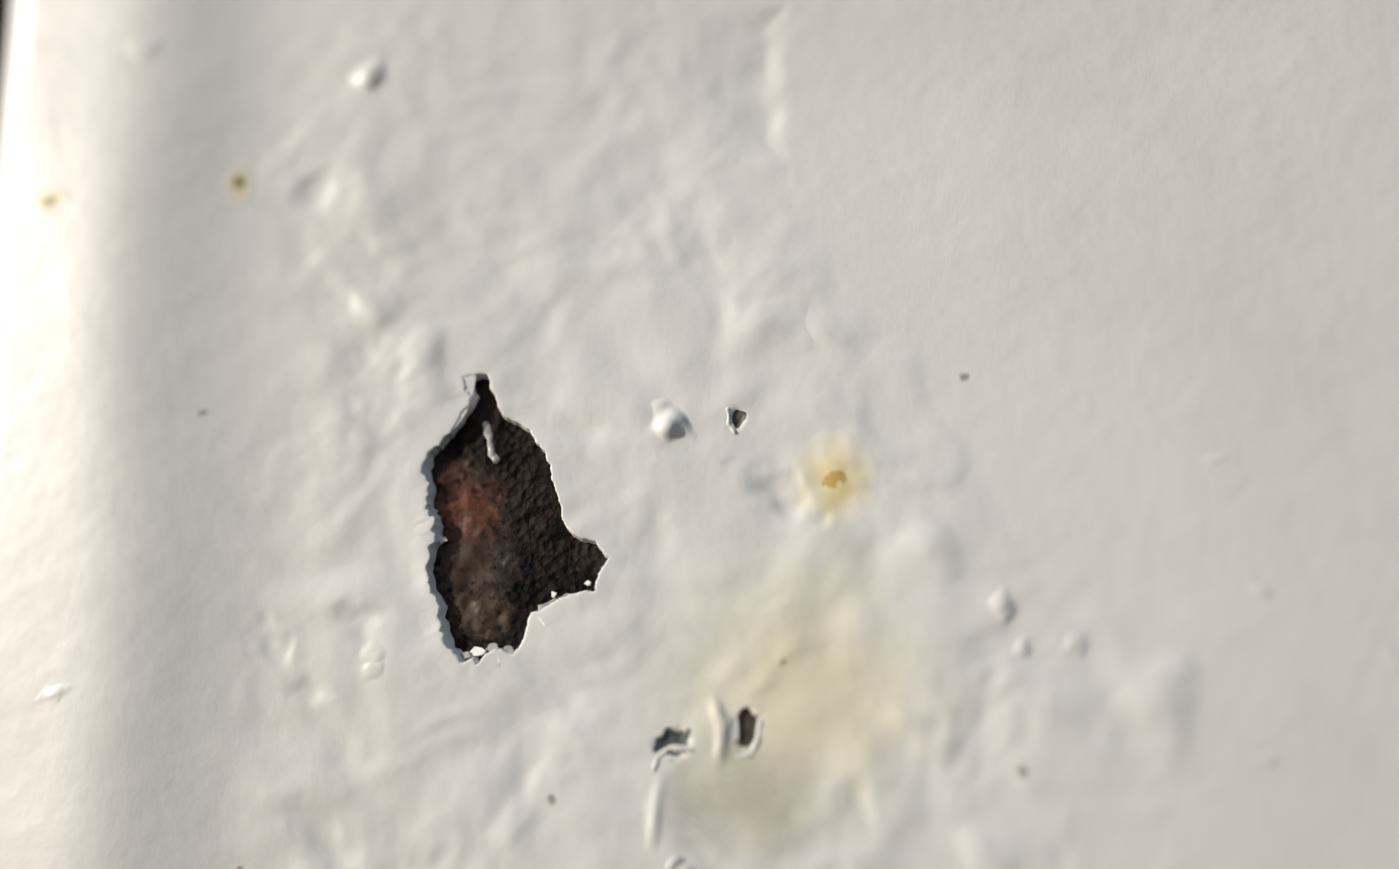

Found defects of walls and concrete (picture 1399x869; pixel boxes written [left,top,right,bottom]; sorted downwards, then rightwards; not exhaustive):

corrosion [30,184,70,216]
corrosion [224,165,255,208]
peeling [403,356,628,684]
corrosion [622,429,977,869]
peeling [652,727,695,772]
peeling [733,708,763,758]